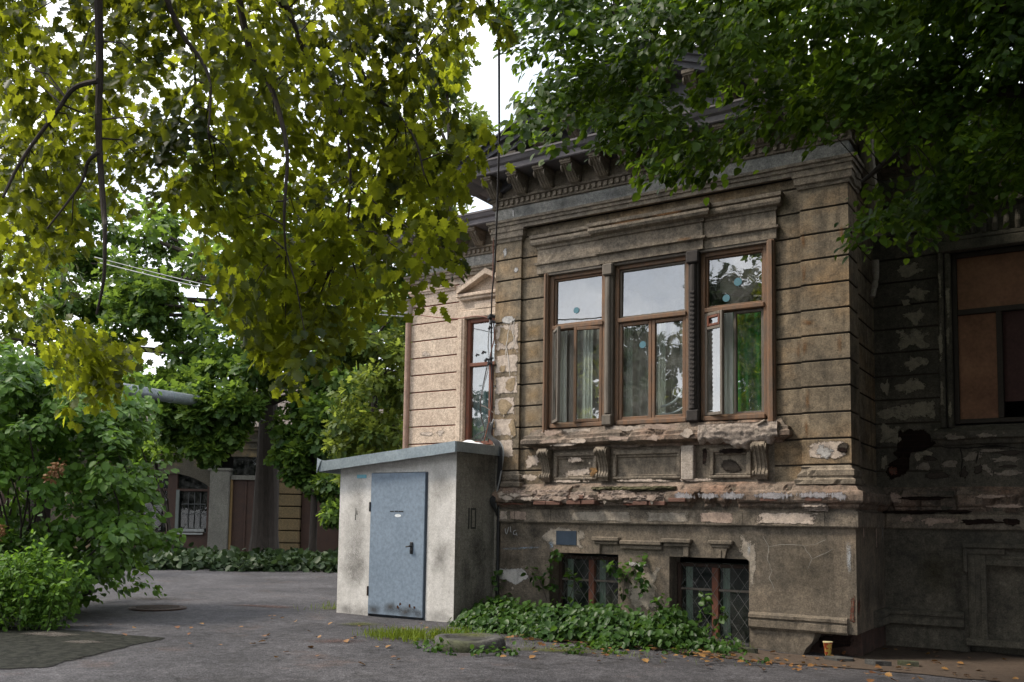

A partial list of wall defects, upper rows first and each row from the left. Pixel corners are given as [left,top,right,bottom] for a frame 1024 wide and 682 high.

peeling [493,316,848,549]
peeling [876,261,1024,527]
peeling [499,567,533,589]
peeling [739,533,757,588]
crack [765,511,829,592]